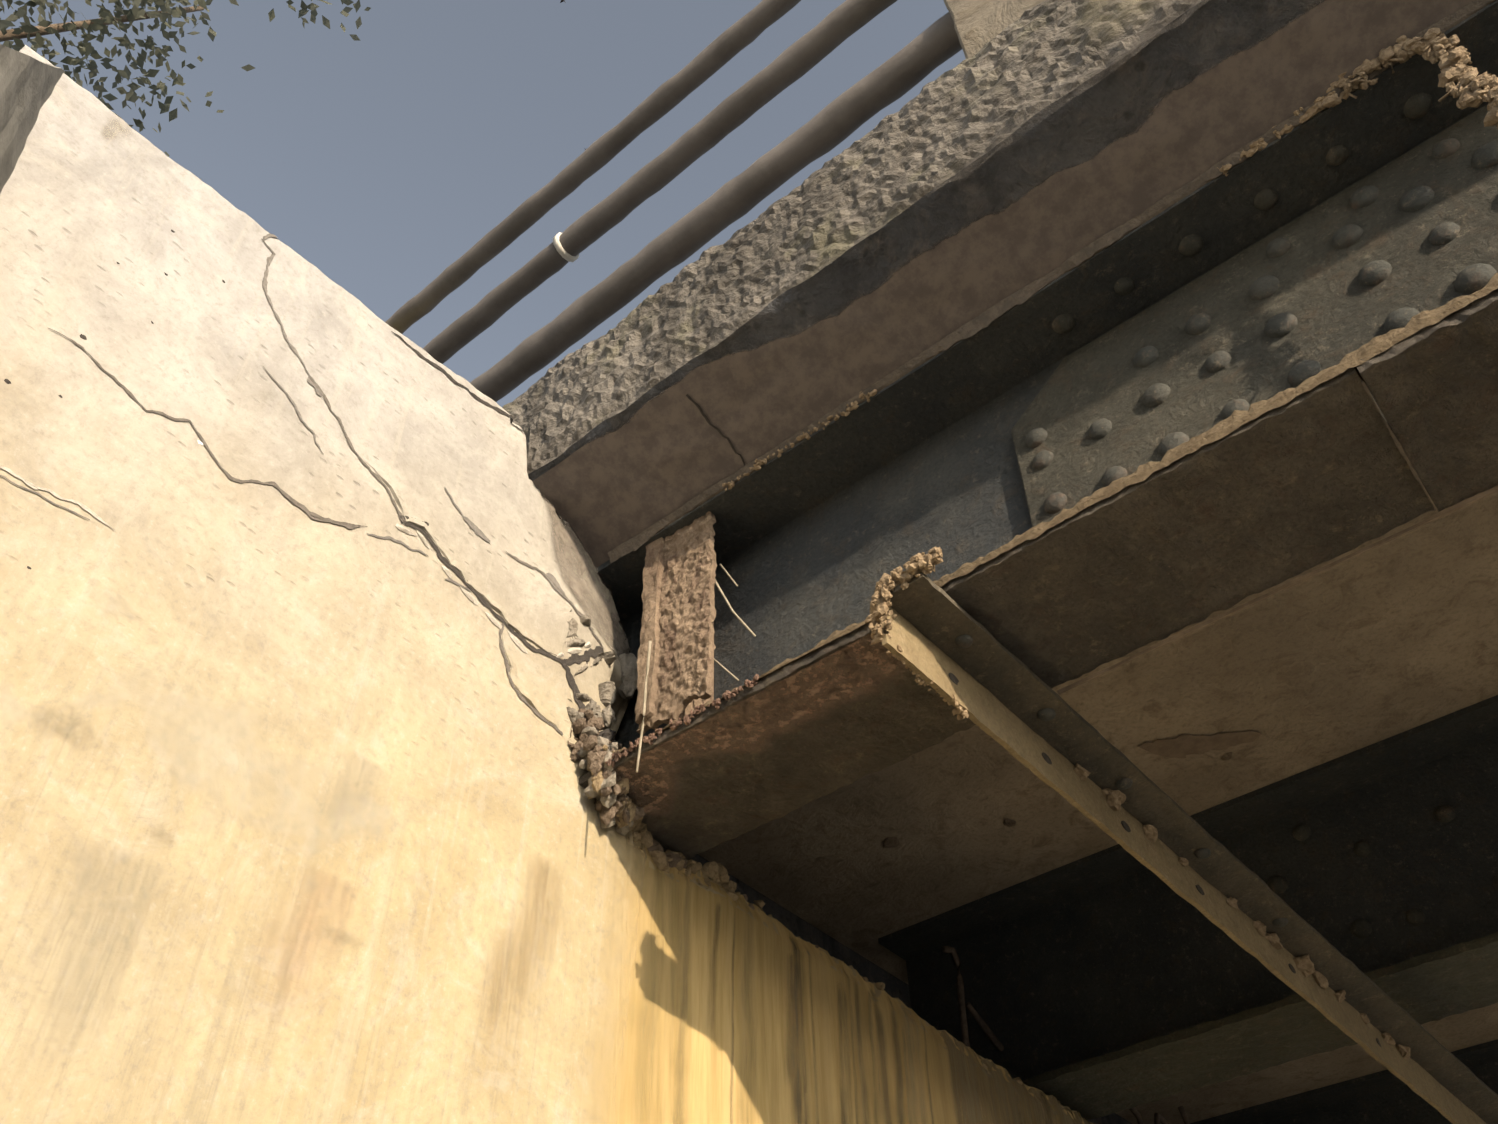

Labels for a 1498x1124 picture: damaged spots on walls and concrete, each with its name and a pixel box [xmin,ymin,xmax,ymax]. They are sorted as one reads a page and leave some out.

crack [0,466,115,531]
crack [49,233,604,735]
crack [686,394,745,466]
spalling [565,609,765,911]
water stain [615,847,1096,1124]